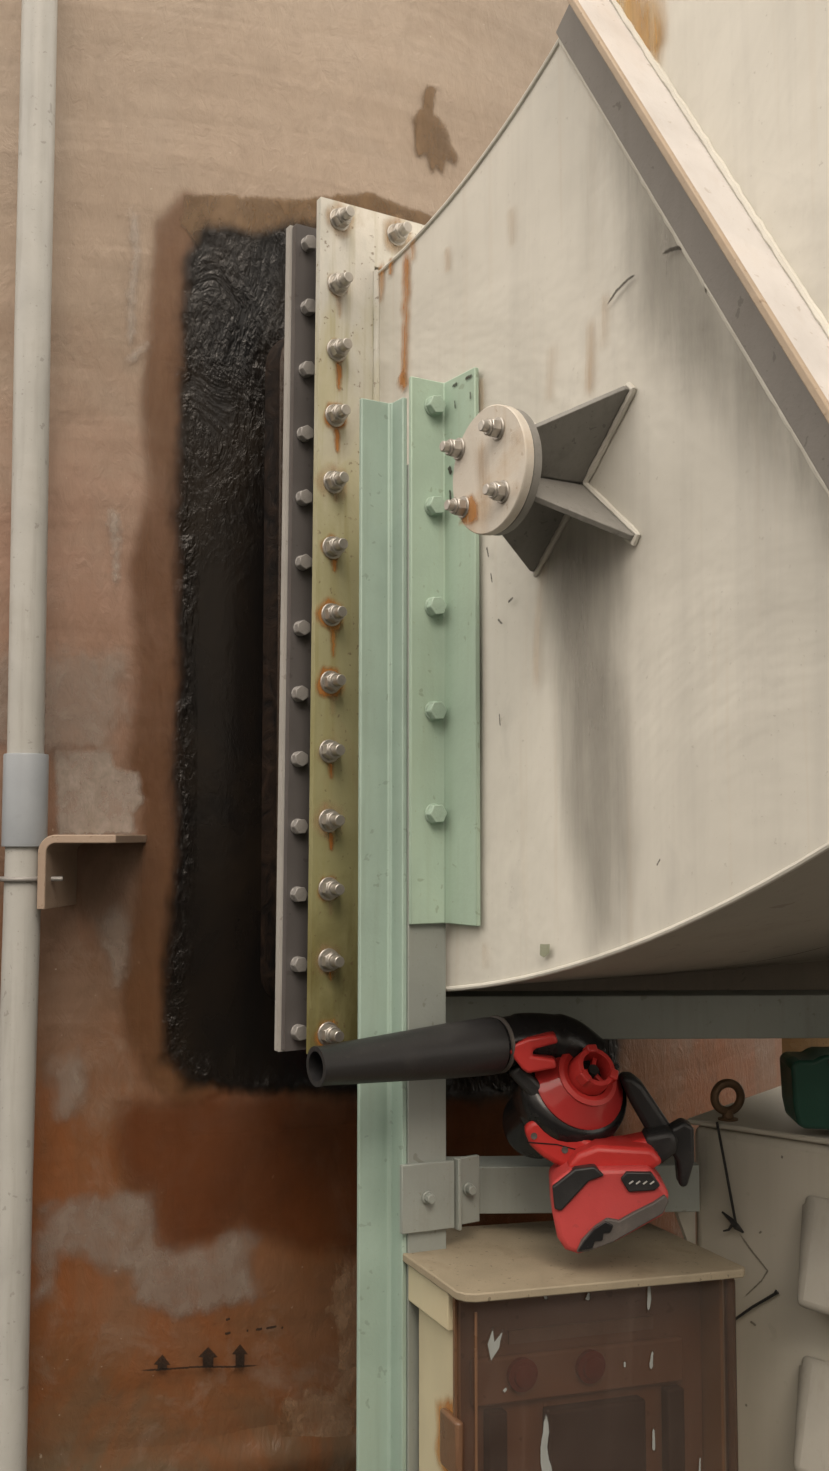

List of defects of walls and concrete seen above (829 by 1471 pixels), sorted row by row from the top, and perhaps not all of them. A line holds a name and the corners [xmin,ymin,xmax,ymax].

corrosion [616,0,659,53]
leakage [414,86,458,172]
corrosion [380,221,413,389]
corrosion [325,361,346,452]
corrosion [316,598,342,697]